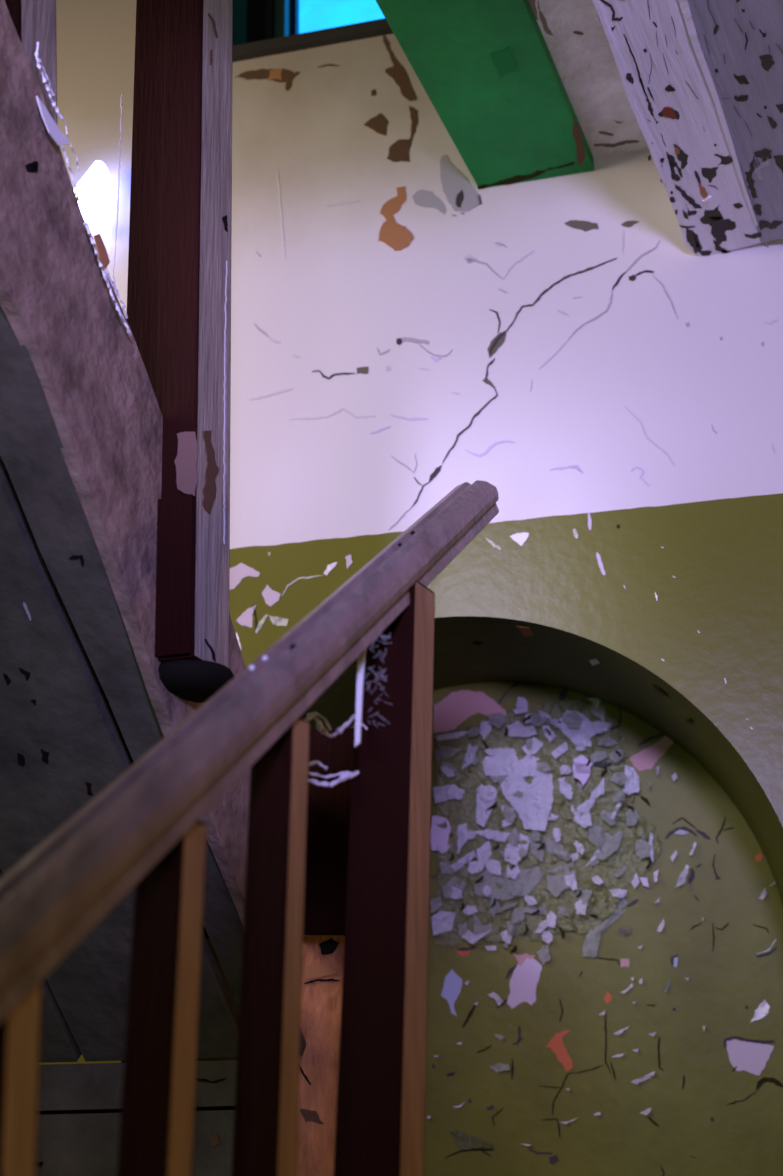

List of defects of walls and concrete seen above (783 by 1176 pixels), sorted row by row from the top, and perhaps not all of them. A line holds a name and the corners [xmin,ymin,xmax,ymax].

flaking render [364,113,388,136]
peeling [646,98,680,125]
flaking render [412,189,464,214]
flaking render [565,220,599,232]
flaking render [666,144,783,256]
peeling [174,261,228,544]
crack [389,225,695,530]
peeling [229,555,353,650]
peeling [430,689,678,1017]
peeling [670,830,697,888]
peeling [745,1000,770,1023]
peeling [726,1039,774,1075]